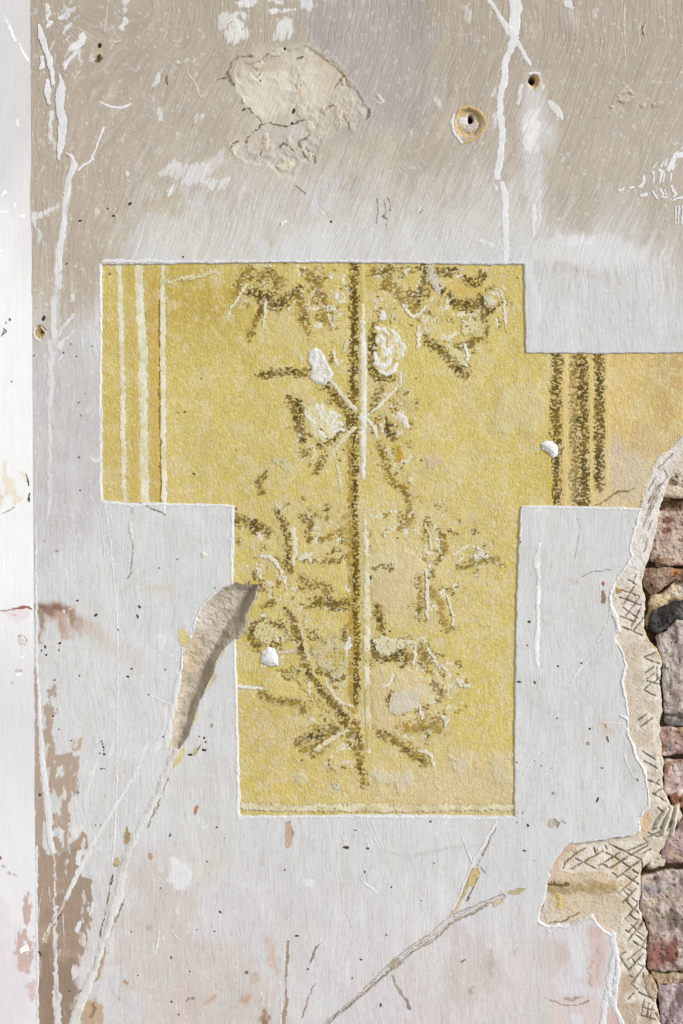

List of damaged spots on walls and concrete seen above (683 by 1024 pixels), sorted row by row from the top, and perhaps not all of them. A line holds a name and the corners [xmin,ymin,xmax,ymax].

spalling [157,0,377,198]
crack [475,0,532,265]
crack [3,24,105,521]
spalling [162,583,259,771]
spalling [538,439,683,1024]
crack [324,821,526,1024]